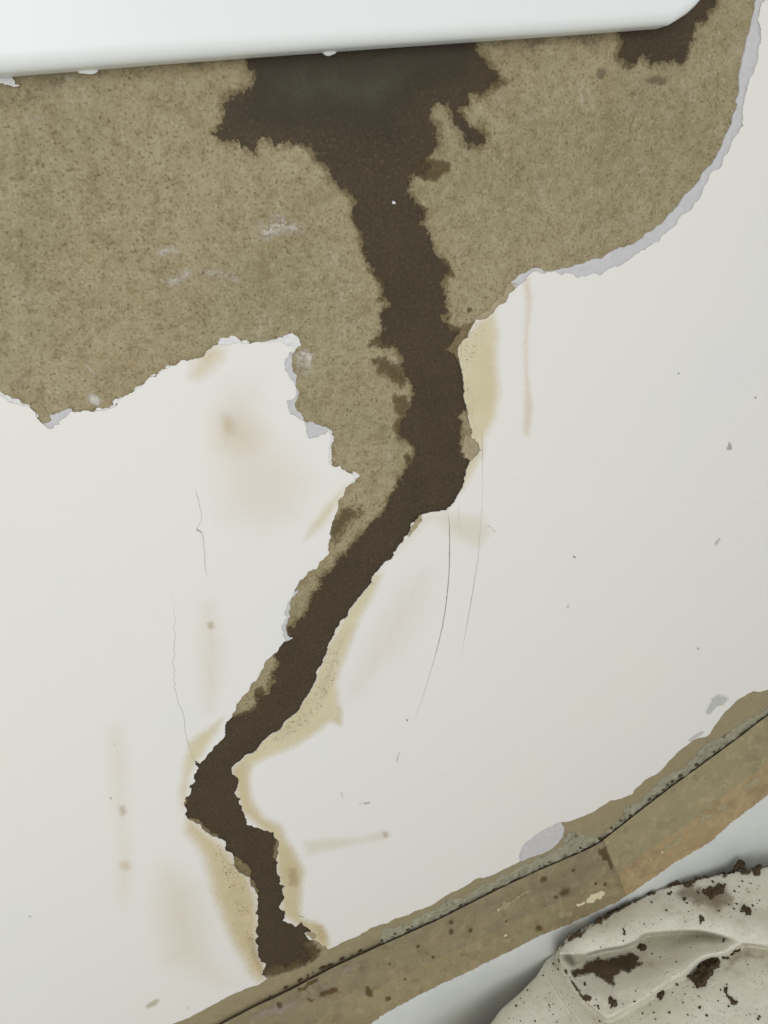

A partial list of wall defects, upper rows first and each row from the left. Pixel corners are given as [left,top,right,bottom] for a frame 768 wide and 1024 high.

peeling [0,59,416,641]
peeling [230,653,279,719]
leakage [185,42,507,977]
peeling [458,409,481,461]
peeling [174,690,768,1024]
peeling [407,0,765,362]